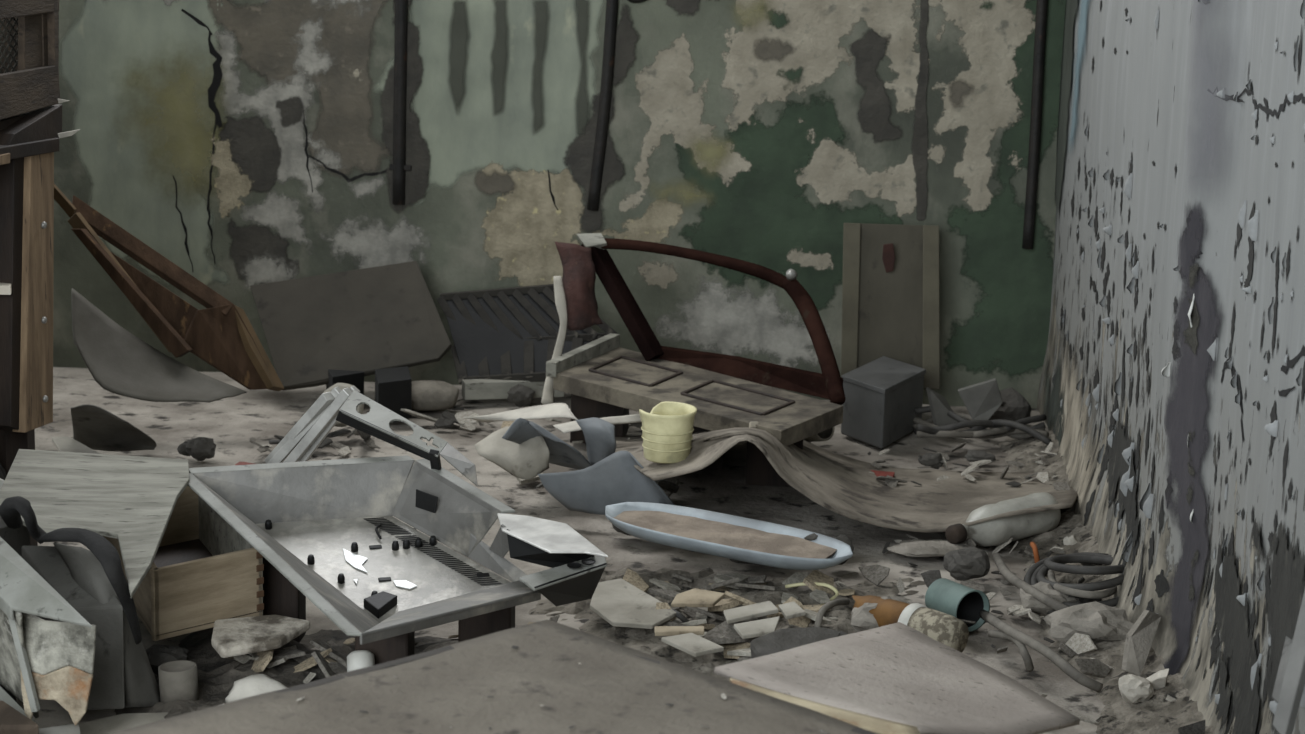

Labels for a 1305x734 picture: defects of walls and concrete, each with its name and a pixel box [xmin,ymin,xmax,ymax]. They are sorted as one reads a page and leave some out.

crack [173,9,223,272]
peeling [61,0,341,285]
spalling [352,177,384,198]
spalling [475,0,1035,290]
spalling [1043,0,1195,612]
peeling [1207,305,1235,361]
crack [1215,66,1305,128]
peeling [1234,196,1305,421]
peeling [1274,0,1305,84]
peeling [1195,387,1305,734]